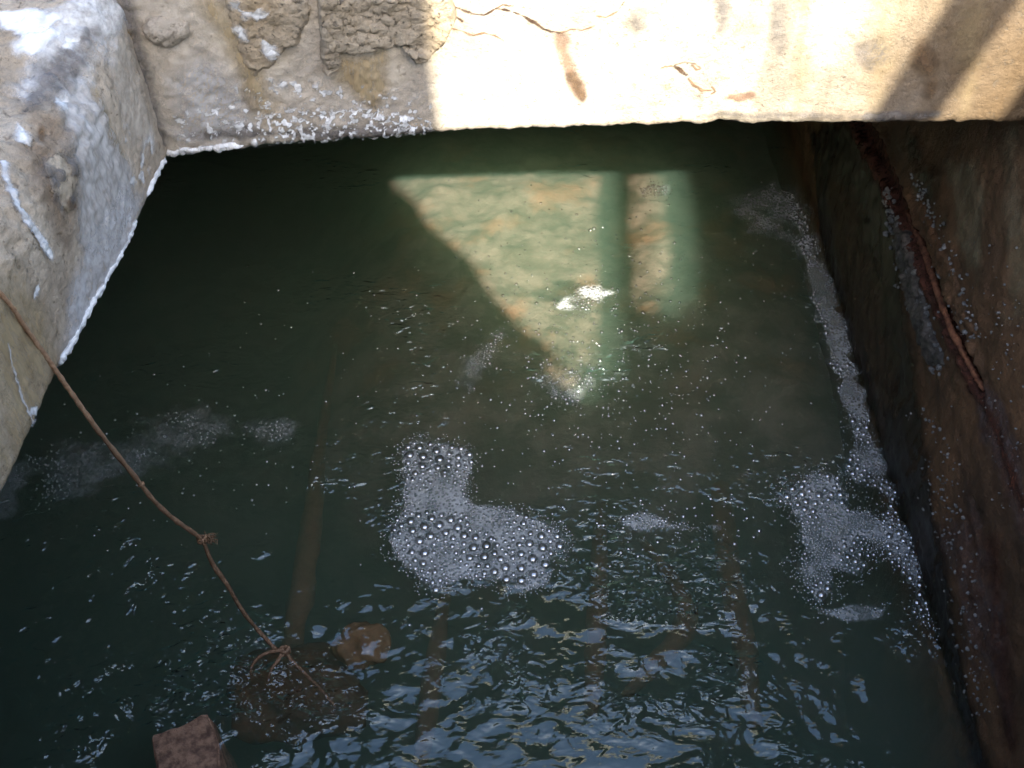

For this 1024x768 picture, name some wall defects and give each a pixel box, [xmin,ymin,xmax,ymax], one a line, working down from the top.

spalling [225,0,457,87]
crack [452,2,624,39]
corrosion [556,33,586,100]
crack [662,62,716,94]
damp [0,0,430,466]
corrosion [849,121,1024,511]